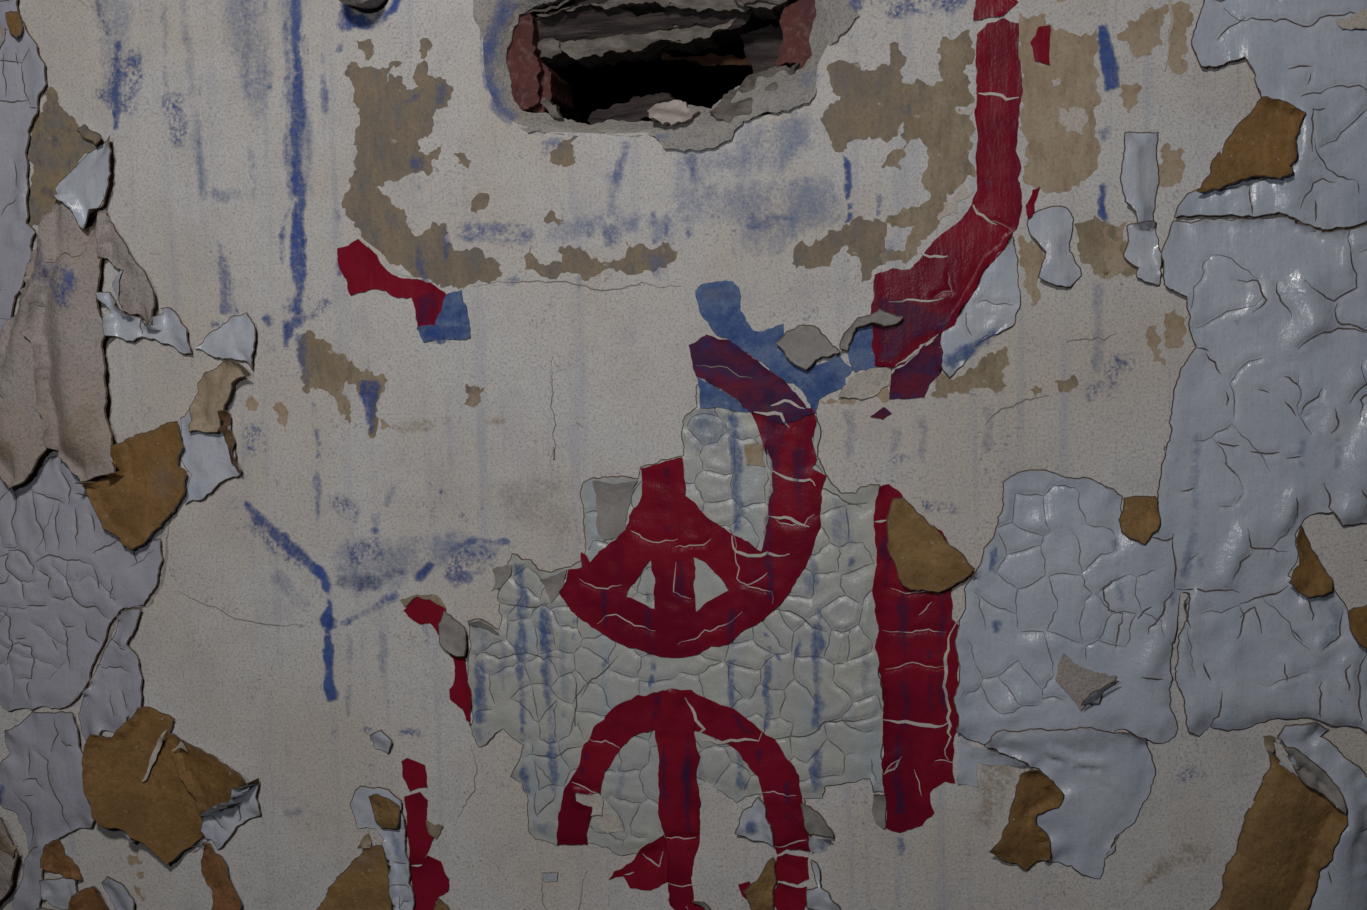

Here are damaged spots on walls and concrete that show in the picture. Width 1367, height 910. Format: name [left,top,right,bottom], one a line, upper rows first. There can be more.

peeling [0,0,289,910]
spalling [341,38,502,290]
peeling [464,0,1367,910]